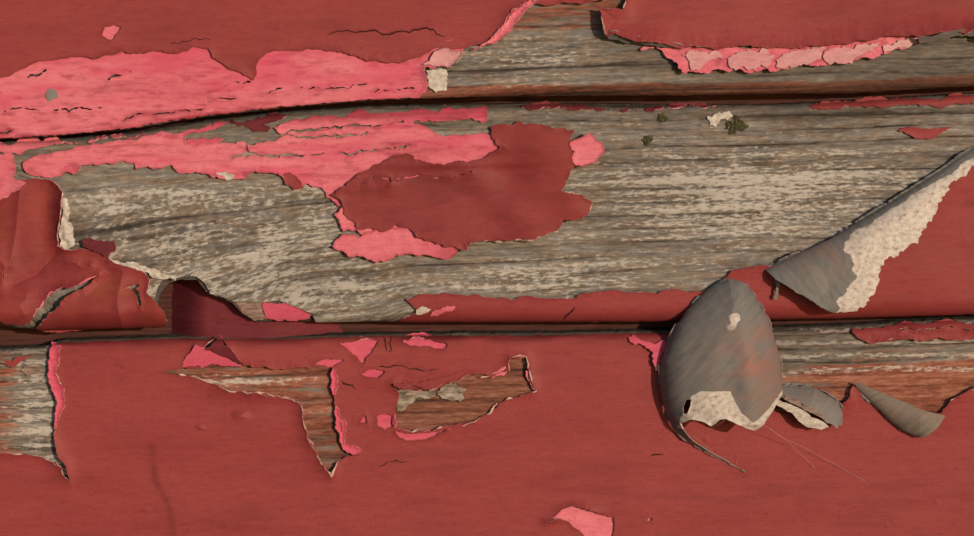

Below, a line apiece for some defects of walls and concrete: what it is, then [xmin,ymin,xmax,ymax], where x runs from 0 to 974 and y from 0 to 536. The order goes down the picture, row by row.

peeling [0,0,974,138]
peeling [0,93,974,480]
peeling [549,506,615,536]